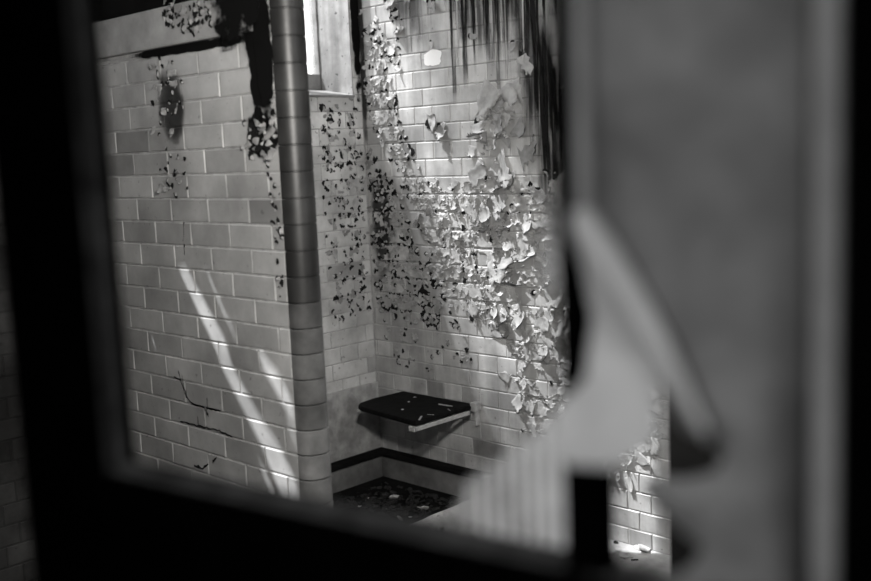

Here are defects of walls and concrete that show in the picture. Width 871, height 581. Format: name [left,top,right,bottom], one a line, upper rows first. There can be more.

peeling [162,0,213,37]
peeling [148,56,188,198]
peeling [241,94,284,245]
peeling [319,0,561,435]
crack [174,371,232,437]
peeling [617,389,669,493]